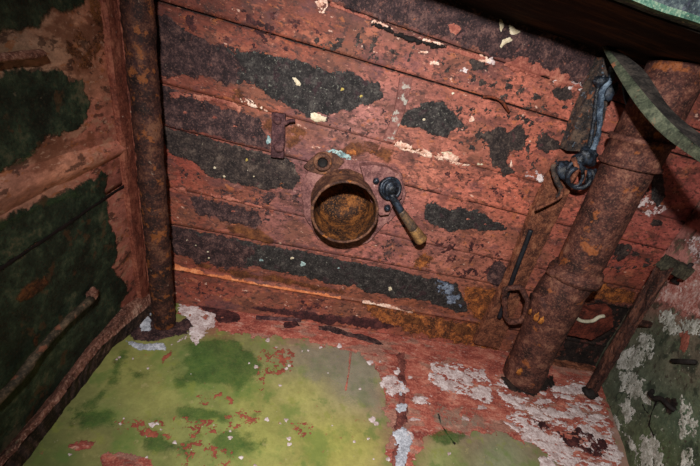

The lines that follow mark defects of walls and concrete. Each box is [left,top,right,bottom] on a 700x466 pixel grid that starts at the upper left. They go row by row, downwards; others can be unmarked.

peeling [315,0,606,101]
peeling [155,14,383,191]
peeling [400,101,475,138]
rust [454,69,568,170]
rust [172,264,344,311]
rust [361,170,576,350]
rust [590,283,636,304]
peeling [162,304,664,466]
peeling [100,451,153,466]
peeling [114,410,269,466]
peeling [678,394,698,440]
peeling [680,447,696,466]